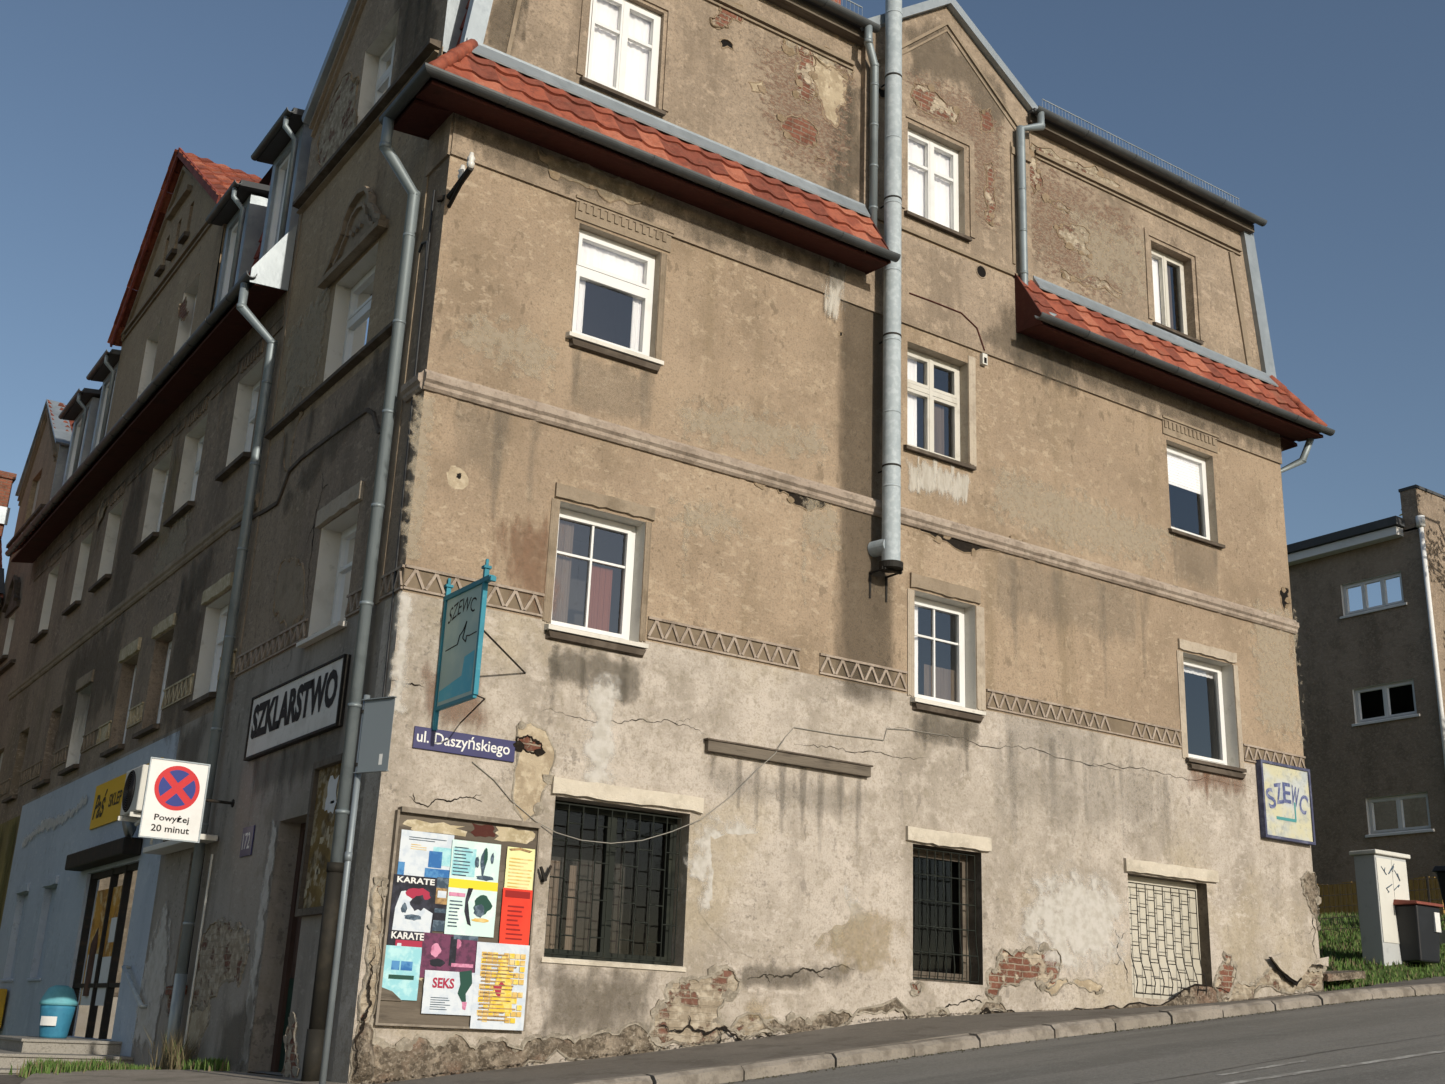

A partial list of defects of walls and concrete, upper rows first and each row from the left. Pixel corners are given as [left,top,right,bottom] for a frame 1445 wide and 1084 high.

flaking render [709,3,746,51]
flaking render [776,37,854,164]
flaking render [511,720,556,822]
crack [750,964,855,982]
flaking render [348,870,1329,1084]